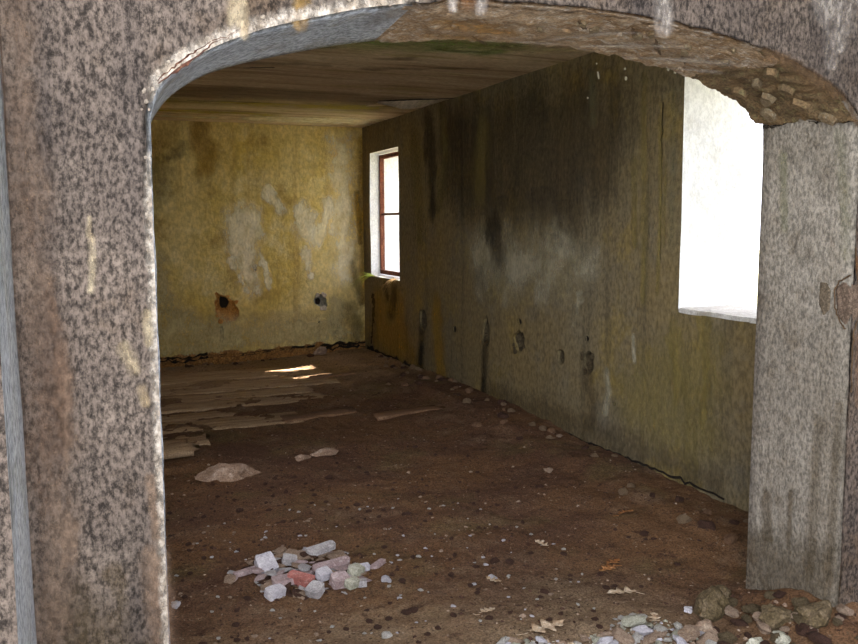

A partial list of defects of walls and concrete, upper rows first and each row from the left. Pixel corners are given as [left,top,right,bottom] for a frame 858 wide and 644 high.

spalling [140,0,854,126]
water stain [424,75,620,299]
spalling [819,282,858,324]
crack [562,430,724,500]